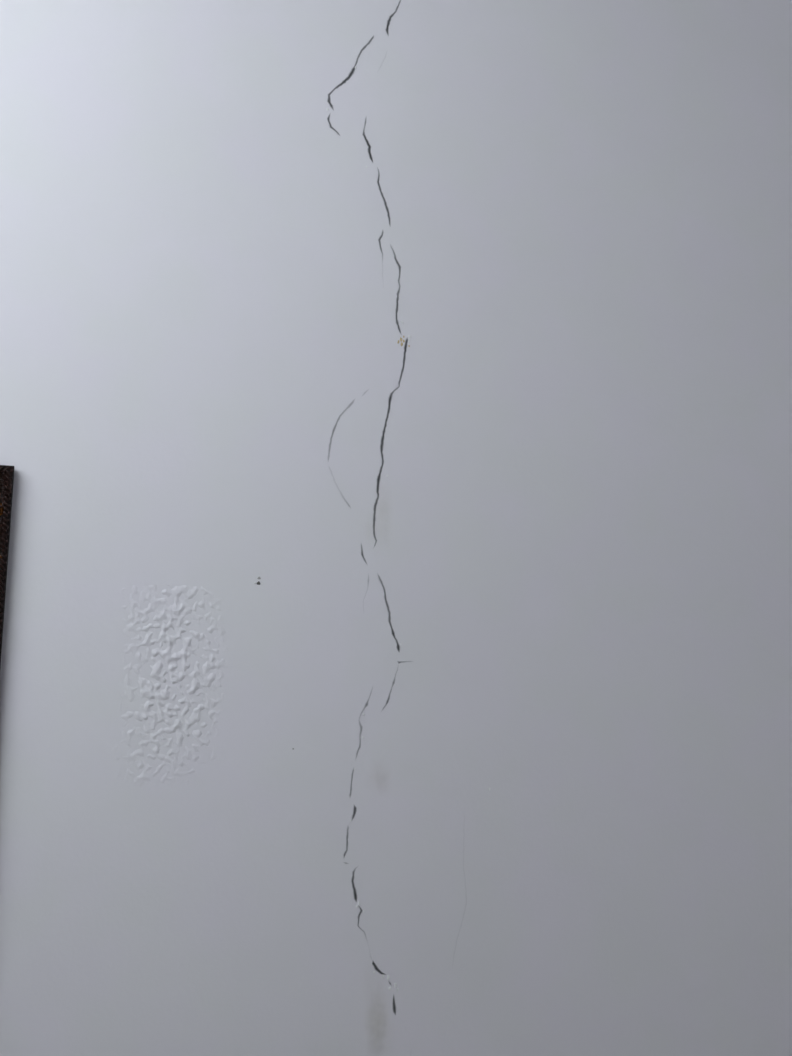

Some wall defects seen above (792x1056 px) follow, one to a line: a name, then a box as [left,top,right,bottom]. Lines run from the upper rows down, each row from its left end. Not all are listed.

crack [327,2,400,133]
crack [362,132,411,560]
crack [384,590,402,663]
crack [344,852,364,923]
crack [372,962,399,1013]